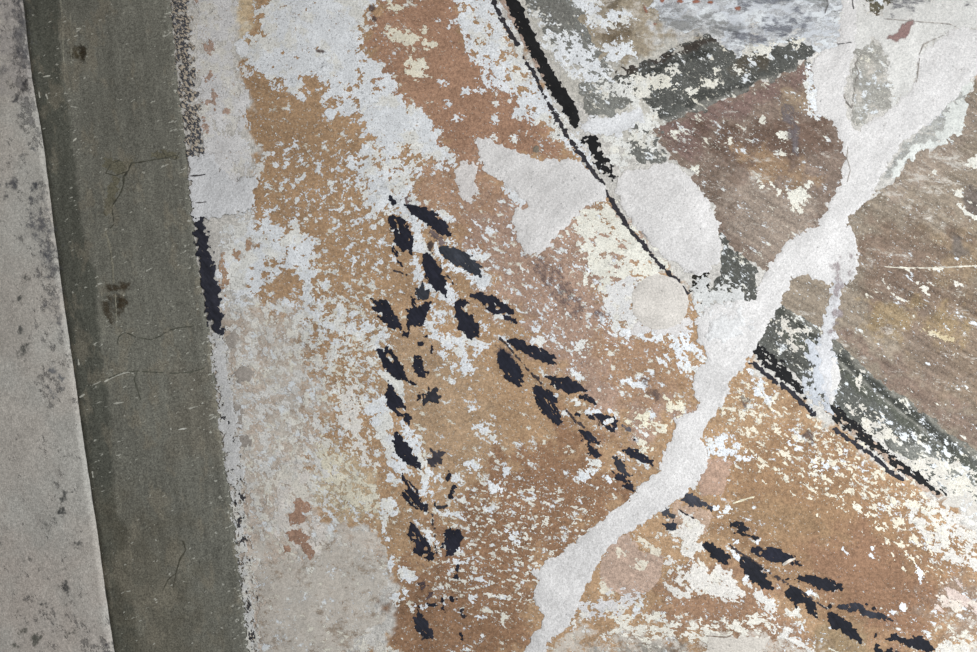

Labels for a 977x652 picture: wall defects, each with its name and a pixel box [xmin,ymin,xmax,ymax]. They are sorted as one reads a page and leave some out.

peeling [851,40,898,126]
peeling [879,92,970,179]
peeling [952,188,977,221]
peeling [965,154,977,169]
peeling [186,0,821,652]
crack [523,0,977,652]
peeling [921,326,955,342]
peeling [703,362,977,652]